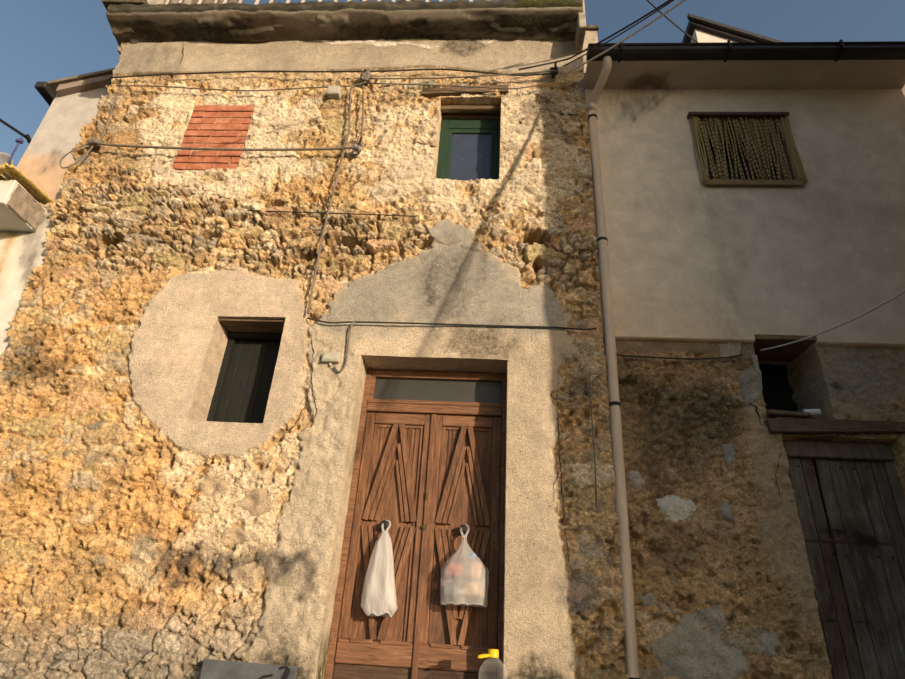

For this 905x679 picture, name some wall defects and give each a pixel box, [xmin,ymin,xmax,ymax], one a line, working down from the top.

leakage [339,20,458,49]
leakage [473,9,575,37]
leakage [508,658,562,679]